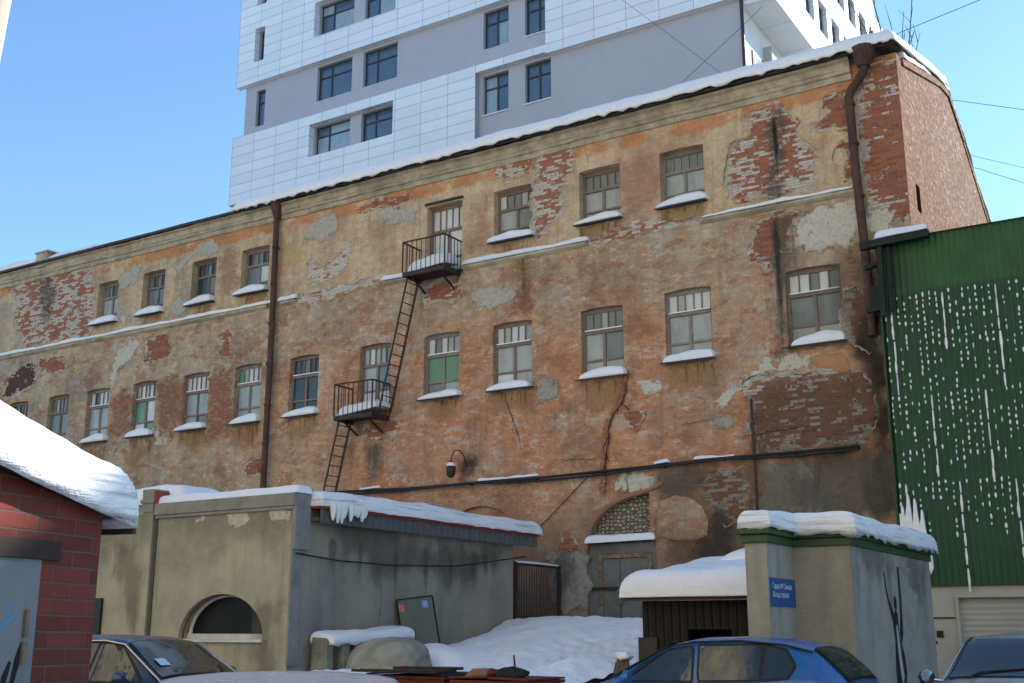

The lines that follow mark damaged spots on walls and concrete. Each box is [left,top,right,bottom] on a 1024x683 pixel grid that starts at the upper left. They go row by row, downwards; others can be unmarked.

spalling [492,148,577,245]
spalling [582,211,704,249]
spalling [722,56,910,276]
spalling [0,267,97,403]
spalling [108,330,173,391]
crack [561,371,631,493]
spalling [616,406,647,432]
spalling [695,346,881,528]